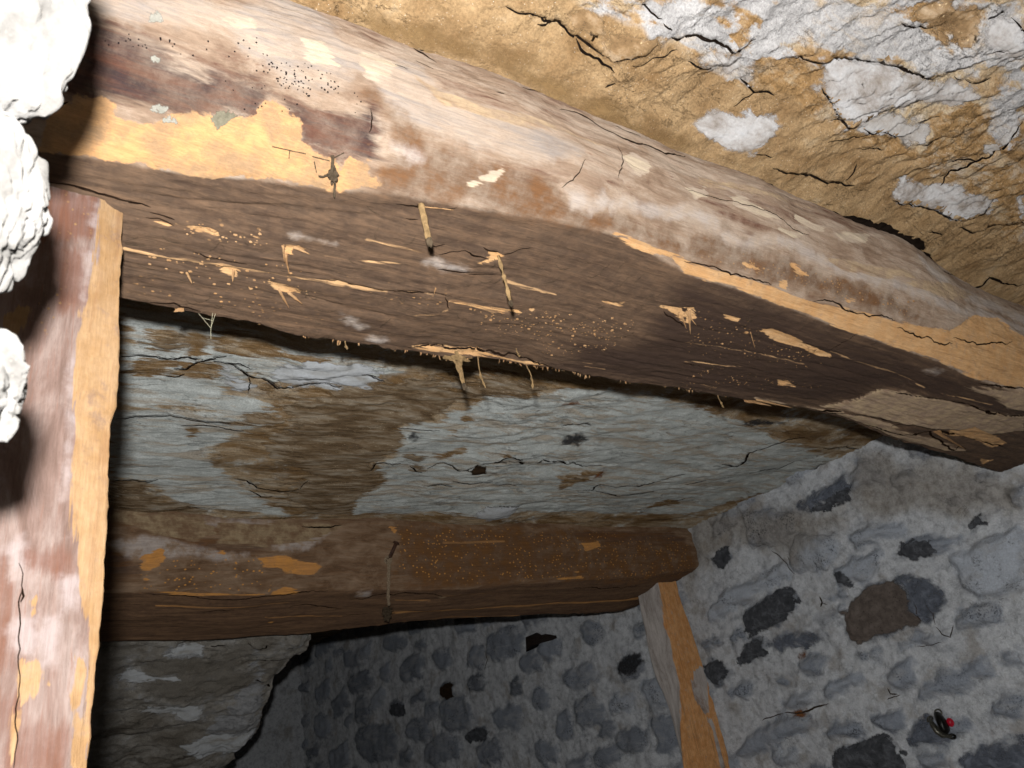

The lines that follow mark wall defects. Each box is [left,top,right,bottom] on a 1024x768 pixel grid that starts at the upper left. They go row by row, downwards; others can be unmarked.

crack [902,19,933,29]
crack [989,8,1024,32]
crack [506,0,774,107]
crack [756,51,991,187]
crack [892,121,1024,235]
crack [689,190,809,235]
crack [685,261,771,285]
crack [121,353,385,391]
crack [13,563,25,768]